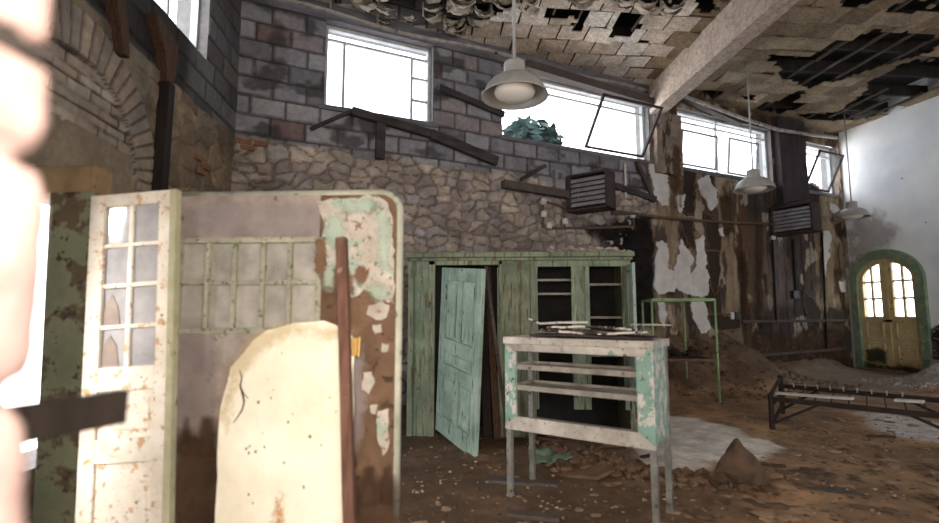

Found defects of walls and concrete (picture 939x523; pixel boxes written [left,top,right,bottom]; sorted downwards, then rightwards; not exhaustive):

flaking render [648,164,741,334]
flaking render [808,183,843,276]